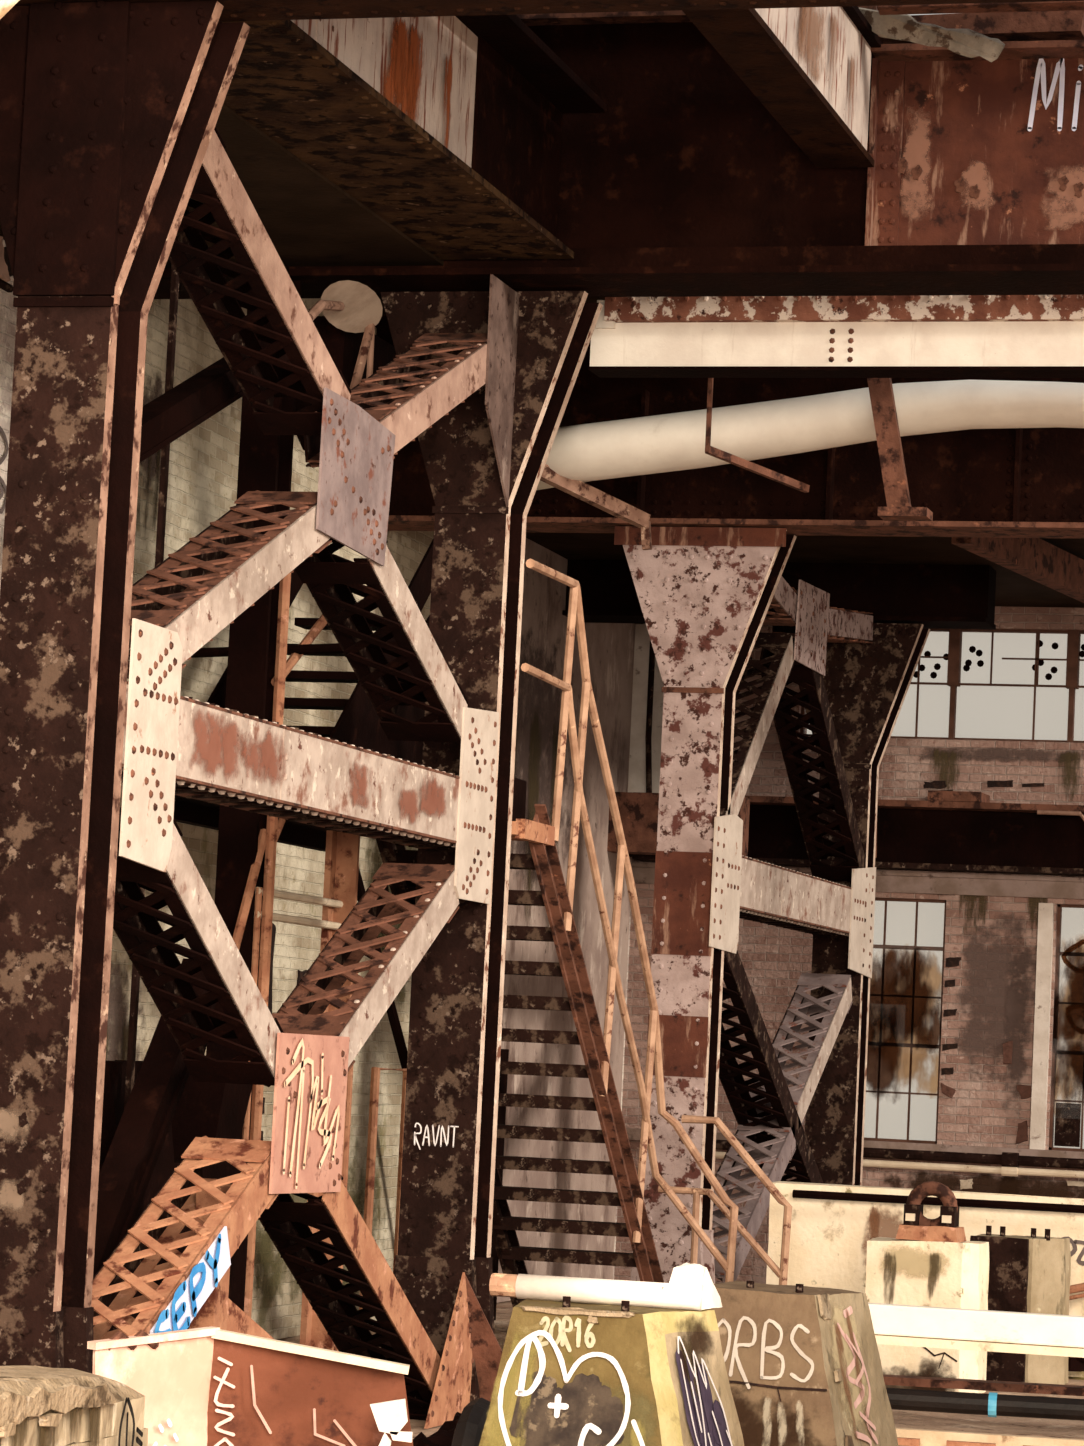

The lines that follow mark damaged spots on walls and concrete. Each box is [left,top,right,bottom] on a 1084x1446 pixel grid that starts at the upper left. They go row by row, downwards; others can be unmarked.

rust [384,18,423,122]
rust [444,55,453,148]
spalling [0,236,11,282]
rust [191,710,285,784]
rust [350,764,373,807]
rust [399,776,446,823]